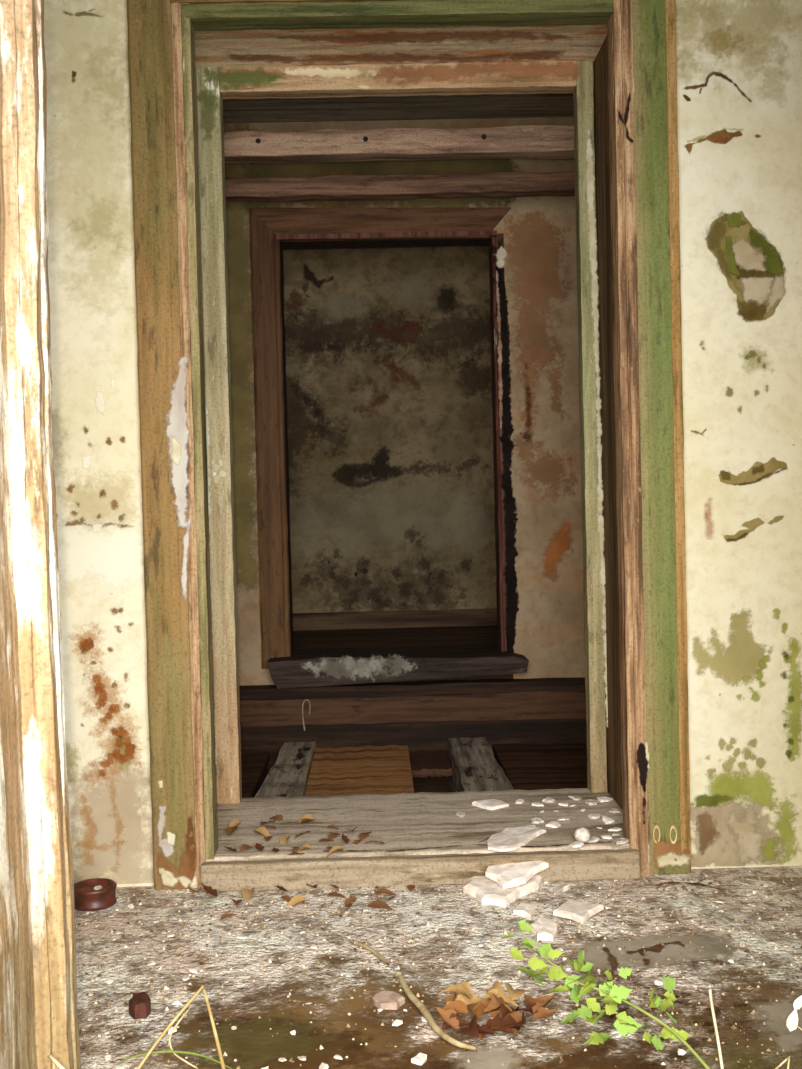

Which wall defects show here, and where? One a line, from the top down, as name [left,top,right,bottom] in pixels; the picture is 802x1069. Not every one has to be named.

crack [683,72,751,101]
spalling [706,211,785,321]
damp [285,289,492,496]
peeling [166,356,191,598]
spalling [719,457,787,485]
spalling [724,516,784,542]
rust [78,633,137,778]
peeling [157,806,175,857]
spalling [690,802,784,867]